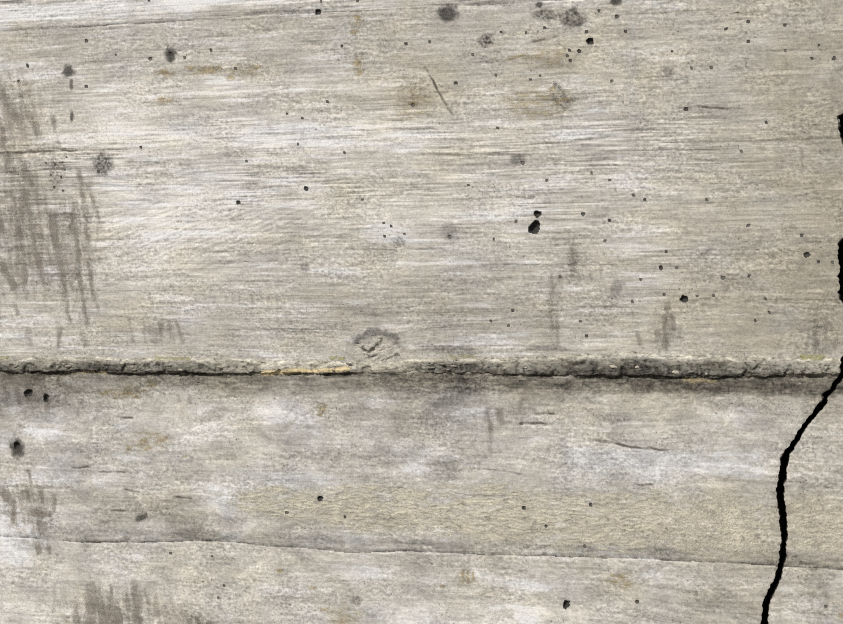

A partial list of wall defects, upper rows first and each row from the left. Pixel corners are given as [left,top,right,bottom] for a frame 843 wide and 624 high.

crack [835,113,843,145]
crack [835,238,843,303]
crack [760,356,843,624]